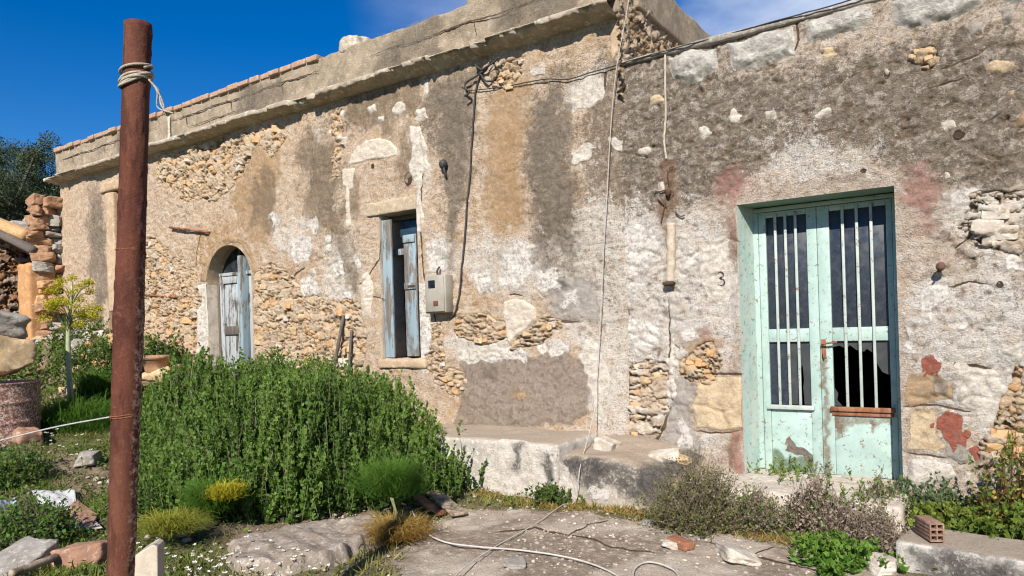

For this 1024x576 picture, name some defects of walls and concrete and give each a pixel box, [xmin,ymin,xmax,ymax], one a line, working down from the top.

spalling [156,125,287,202]
spalling [329,106,348,180]
water stain [522,92,575,267]
spalling [957,191,1024,271]
spalling [144,232,202,367]
spalling [252,216,368,377]
spalling [419,267,580,397]
spalling [627,322,723,436]
peeling [786,437,814,470]
flaking render [905,371,954,451]